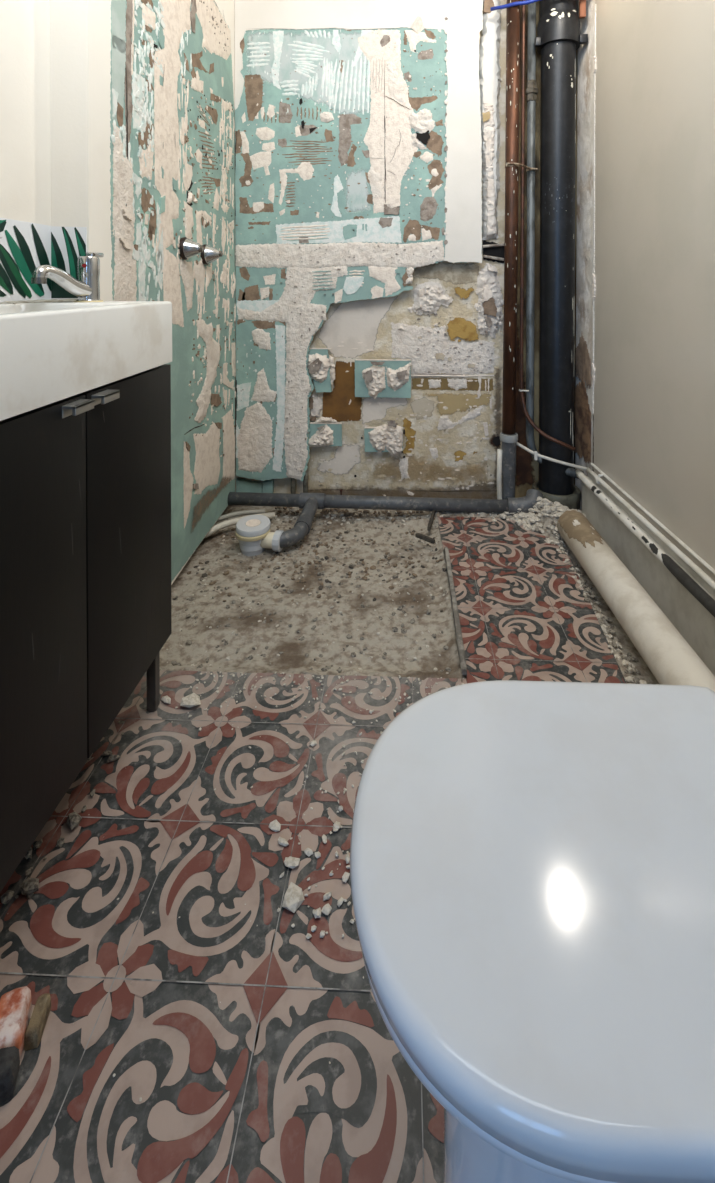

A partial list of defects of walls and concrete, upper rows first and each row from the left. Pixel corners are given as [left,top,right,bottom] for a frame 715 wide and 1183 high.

peeling [117,0,166,301]
peeling [177,13,314,266]
peeling [236,274,279,315]
peeling [235,325,286,473]
flaking render [362,397,407,424]
spalling [415,510,467,675]